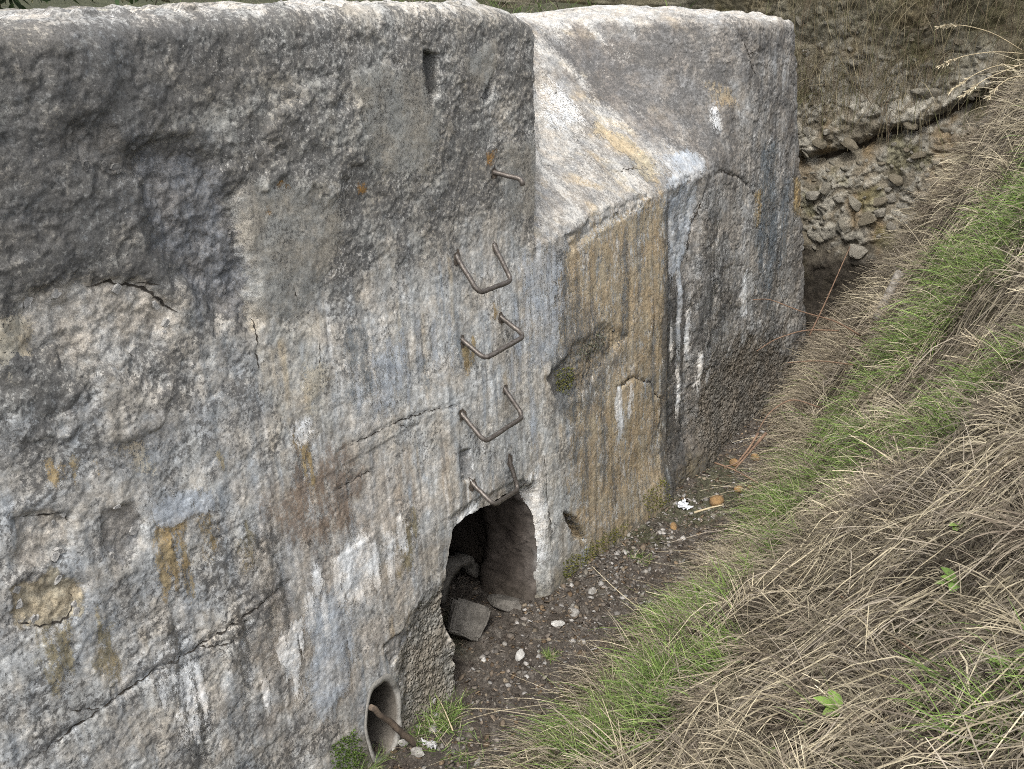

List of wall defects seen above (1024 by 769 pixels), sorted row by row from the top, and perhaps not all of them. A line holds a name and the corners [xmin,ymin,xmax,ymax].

crack [86,279,177,312]
water stain [536,75,791,502]
crack [342,404,460,449]
crack [18,593,72,628]
spalling [10,508,84,631]
crack [28,579,290,761]
spalling [383,580,456,731]